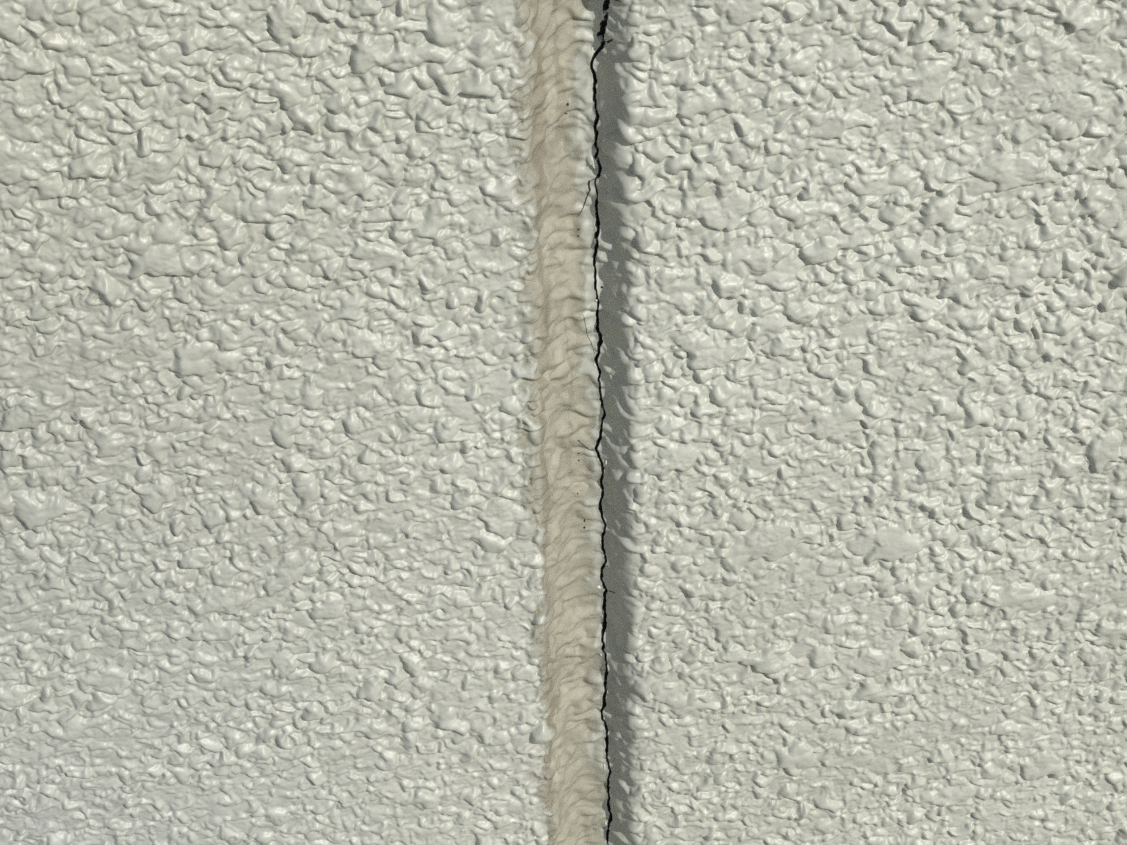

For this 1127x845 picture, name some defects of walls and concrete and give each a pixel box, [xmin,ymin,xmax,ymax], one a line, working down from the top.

crack [577,0,621,845]